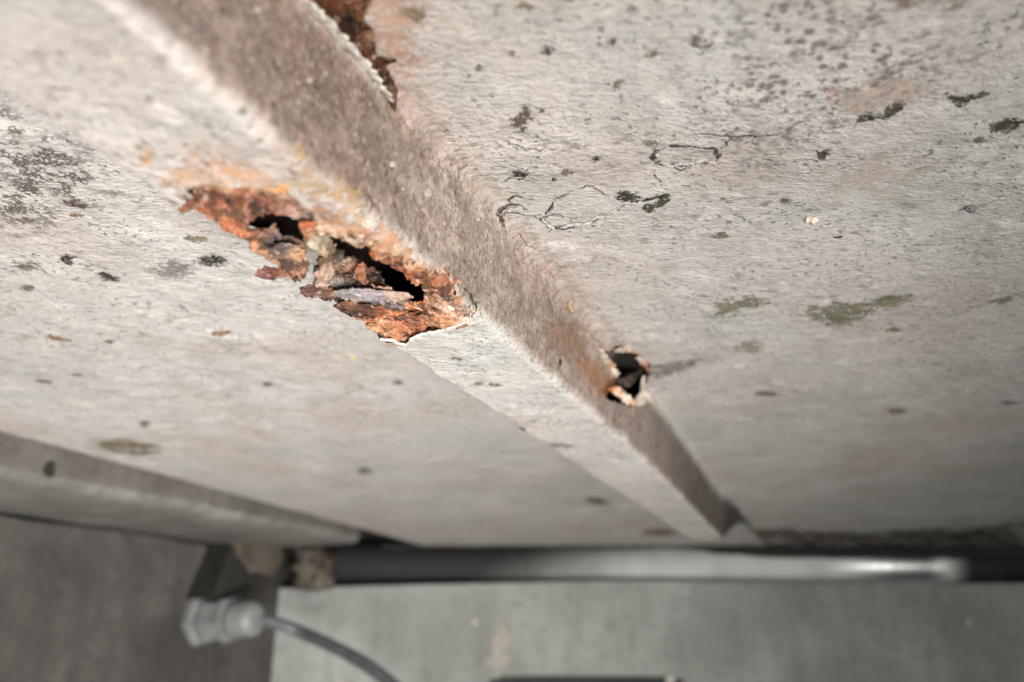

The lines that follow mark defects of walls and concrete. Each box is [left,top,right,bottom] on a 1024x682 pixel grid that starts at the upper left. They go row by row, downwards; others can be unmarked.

corrosion [312,0,421,97]
crack [649,133,777,171]
peeling [178,198,199,214]
peeling [255,242,307,282]
corrosion [165,148,475,346]
peeling [332,251,414,318]
crack [496,185,625,250]